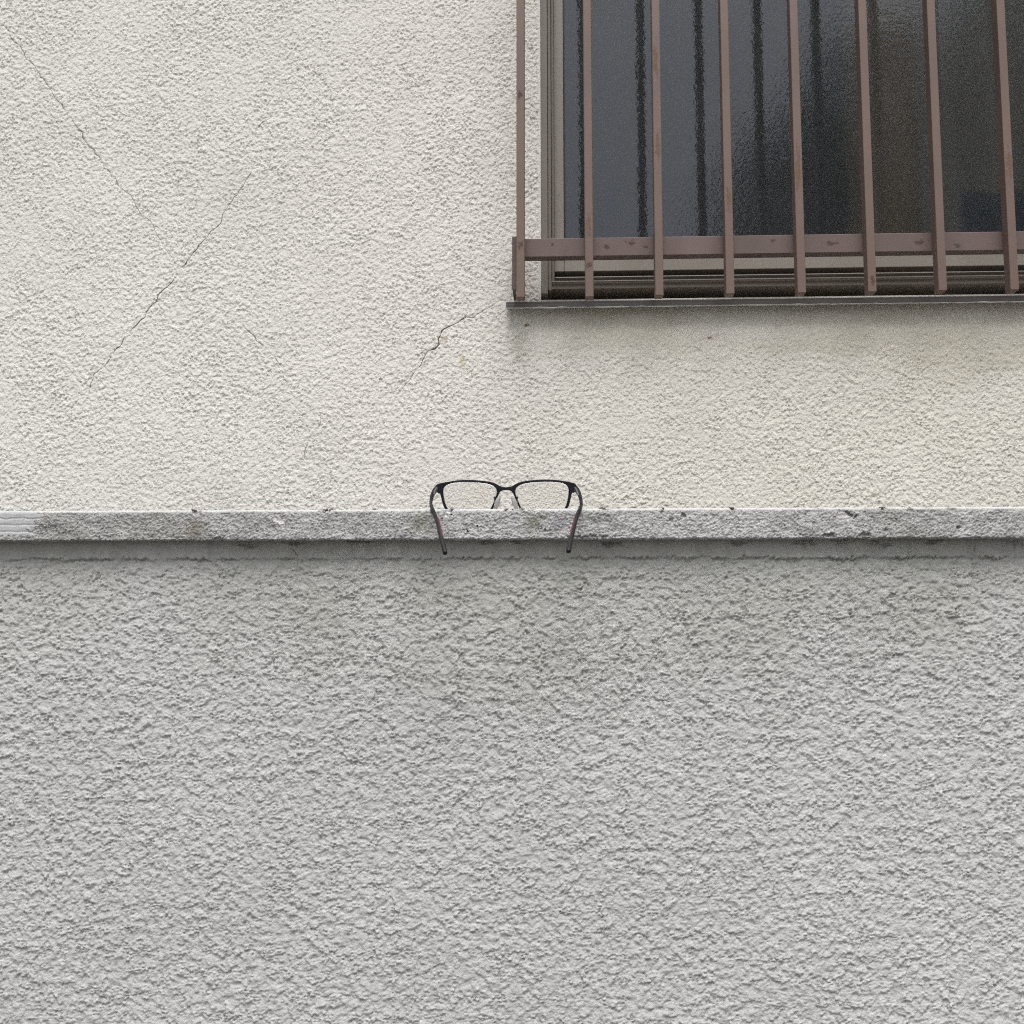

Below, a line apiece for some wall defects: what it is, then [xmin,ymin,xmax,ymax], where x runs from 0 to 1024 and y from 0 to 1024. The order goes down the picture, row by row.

crack [4,26,251,410]
crack [402,305,493,389]